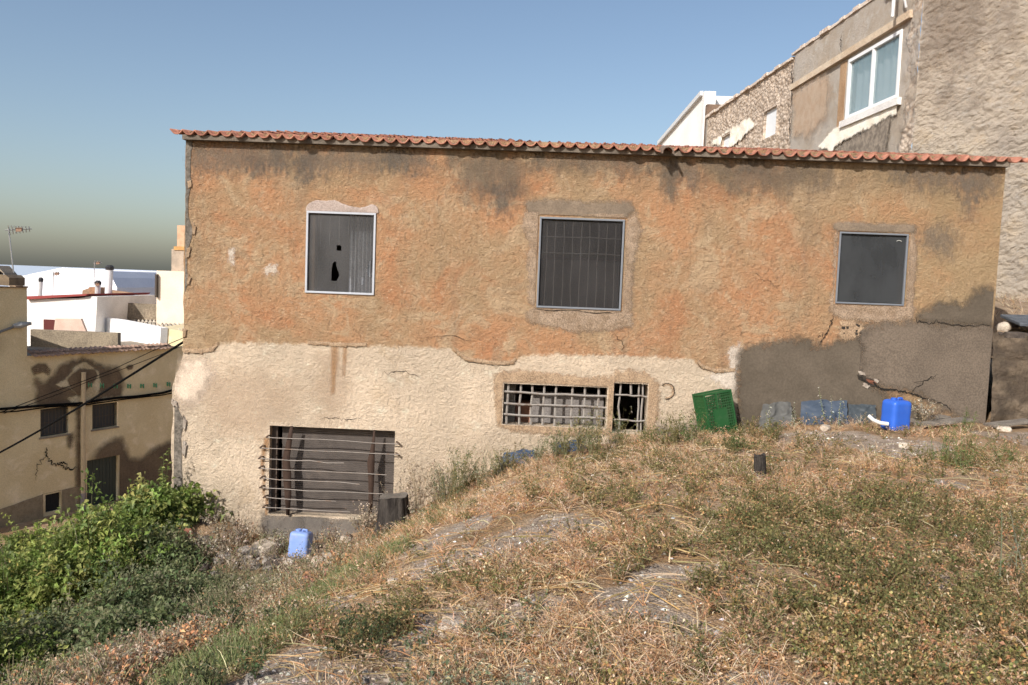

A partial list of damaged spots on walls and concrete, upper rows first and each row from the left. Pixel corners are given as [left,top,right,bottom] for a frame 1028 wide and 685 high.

crack [858,375,951,410]
crack [35,447,77,476]